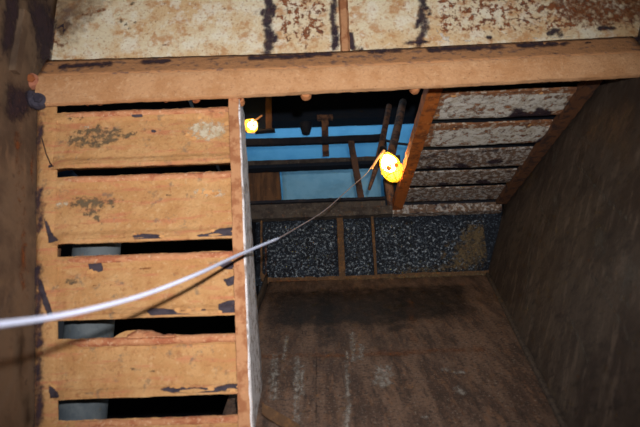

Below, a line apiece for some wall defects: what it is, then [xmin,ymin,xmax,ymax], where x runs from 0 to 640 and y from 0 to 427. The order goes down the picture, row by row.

corrosion [248,0,339,60]
corrosion [349,0,640,54]
peeling [185,116,229,141]
leakage [376,221,476,271]
leakage [274,286,464,334]